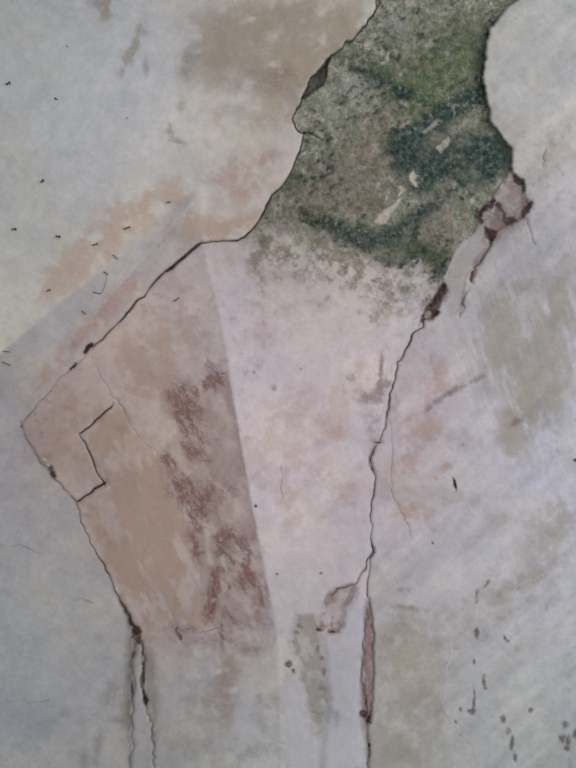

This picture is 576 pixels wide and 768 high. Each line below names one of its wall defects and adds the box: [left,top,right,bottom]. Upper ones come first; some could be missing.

spalling [292,51,339,134]
damp [205,0,515,304]
spalling [470,167,534,282]
crack [42,457,56,478]
crack [77,406,112,502]
crack [81,523,156,729]
flaking render [168,363,267,620]
crack [333,322,424,747]